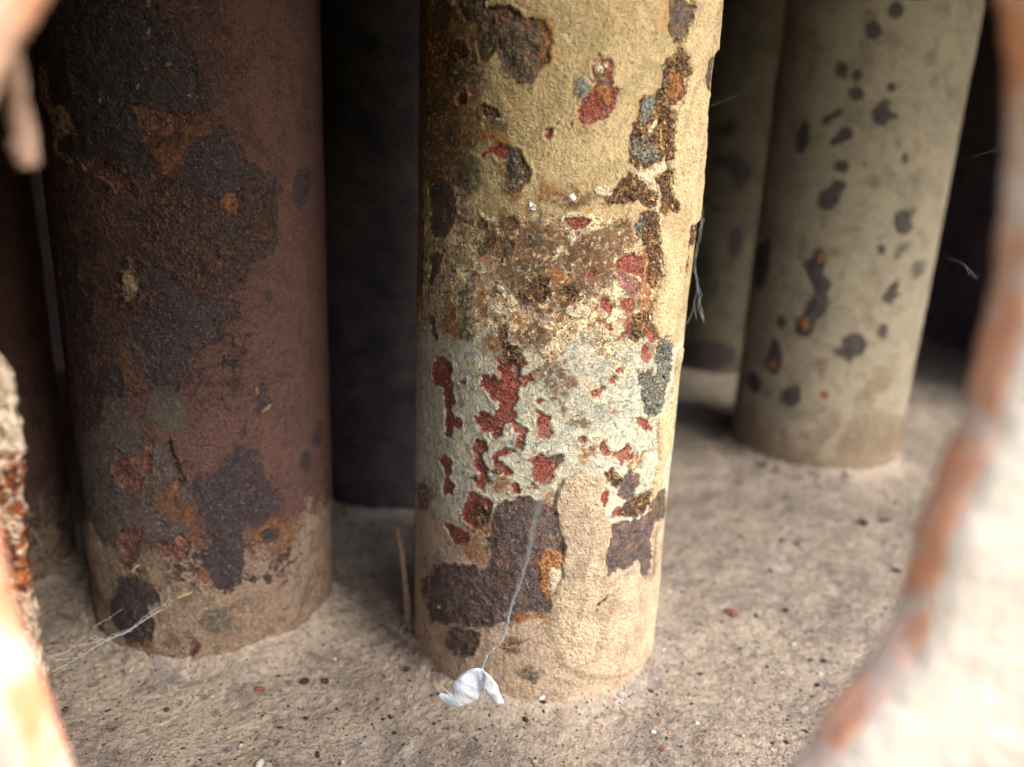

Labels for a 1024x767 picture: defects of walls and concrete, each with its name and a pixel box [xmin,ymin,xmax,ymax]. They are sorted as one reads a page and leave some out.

peeling [542,52,621,141]
rust [34,0,313,312]
rust [429,179,458,239]
peeling [630,161,666,216]
rust [484,268,579,365]
peeling [565,252,660,341]
rust [747,247,832,394]
peeling [579,367,624,399]
peeling [431,356,565,545]
rust [0,353,59,721]
rust [153,427,299,591]
peeling [600,487,623,518]